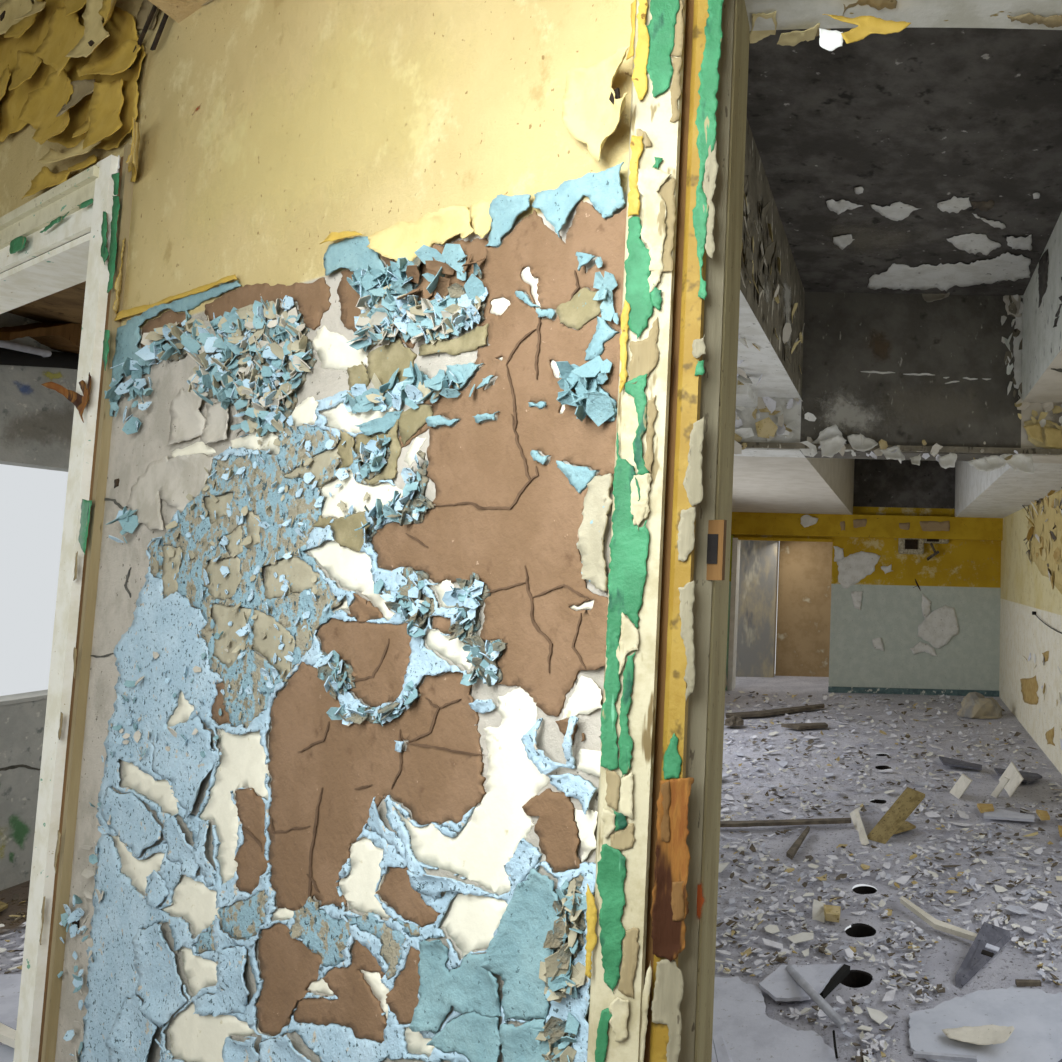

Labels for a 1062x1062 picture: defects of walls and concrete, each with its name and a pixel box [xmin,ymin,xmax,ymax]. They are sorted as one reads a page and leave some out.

peeling [749,0,911,51]
peeling [692,0,724,300]
crack [569,270,580,301]
peeling [867,196,1049,307]
crack [434,317,541,510]
peeling [734,294,1062,474]
peeling [0,0,684,1062]
peeling [677,417,705,562]
crack [486,565,590,673]
crack [0,763,41,771]
crack [355,697,484,790]
crack [242,787,323,898]